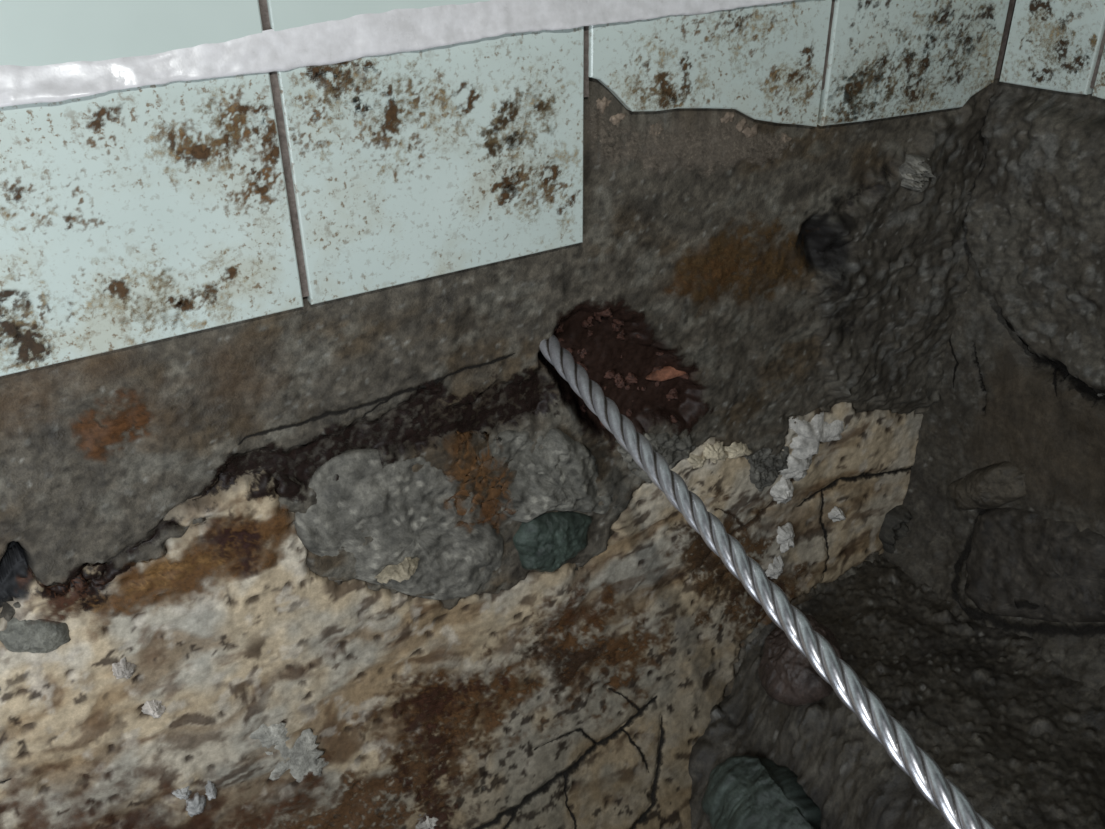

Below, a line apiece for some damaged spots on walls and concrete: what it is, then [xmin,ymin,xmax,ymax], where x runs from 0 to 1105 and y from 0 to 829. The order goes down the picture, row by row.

corrosion [150,86,284,204]
corrosion [480,82,580,223]
corrosion [0,278,50,368]
spalling [553,300,713,435]
crack [1001,309,1105,403]
crack [25,353,559,611]
efflorescence [765,522,795,579]
spalling [671,402,923,602]
efflorescence [770,411,848,505]
spalling [0,466,764,829]
leakage [172,781,217,817]
crack [475,688,665,829]